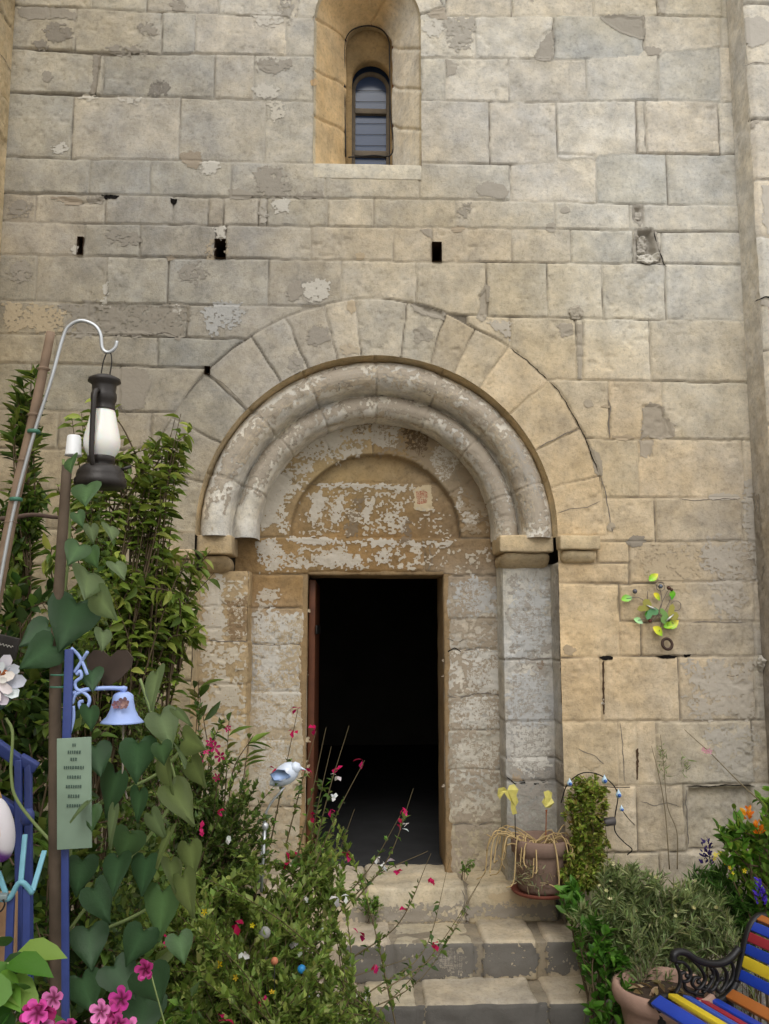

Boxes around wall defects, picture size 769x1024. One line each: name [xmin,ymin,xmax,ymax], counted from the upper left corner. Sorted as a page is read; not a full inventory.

peeling [198,365,577,872]